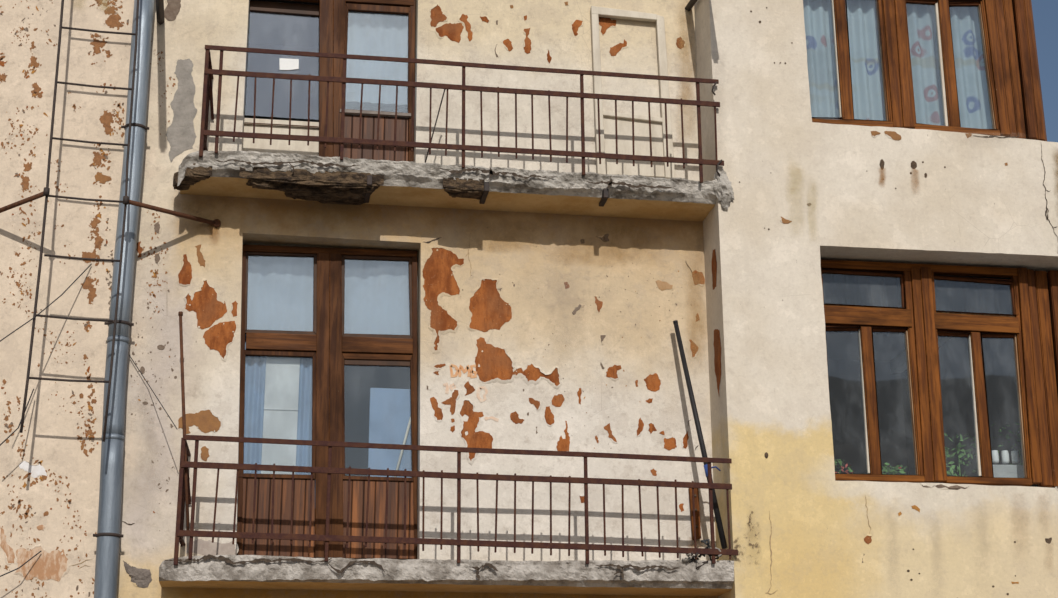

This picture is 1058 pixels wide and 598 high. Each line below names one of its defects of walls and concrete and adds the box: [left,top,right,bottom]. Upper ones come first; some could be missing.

peeling [429,3,498,43]
peeling [59,83,125,311]
spalling [173,163,212,191]
spalling [239,167,384,205]
crack [973,135,1058,254]
peeling [0,0,98,457]
peeling [130,210,238,434]
peeling [422,244,662,466]
peeling [636,417,689,450]
spalling [123,561,152,588]
crack [469,563,498,580]
crack [596,564,679,580]